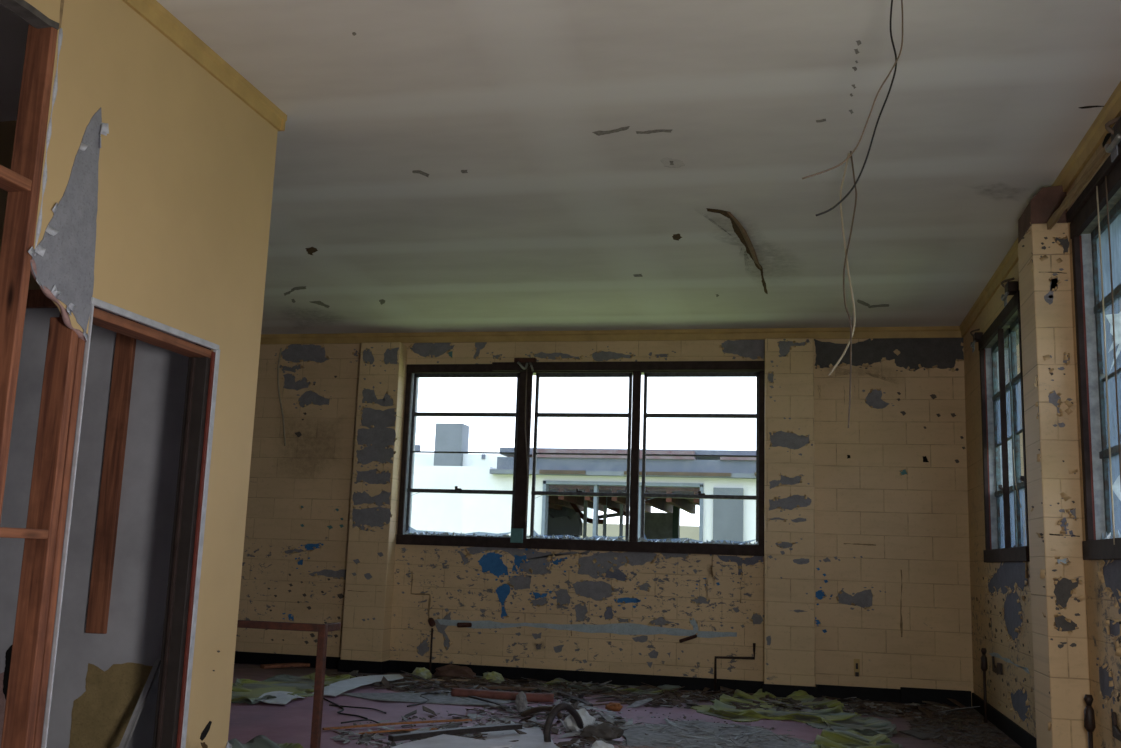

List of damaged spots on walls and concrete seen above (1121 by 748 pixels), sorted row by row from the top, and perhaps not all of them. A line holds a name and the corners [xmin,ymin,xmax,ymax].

peeling [28,244,46,257]
peeling [275,344,332,437]
peeling [719,338,964,402]
peeling [327,343,455,532]
peeling [769,417,813,456]
peeling [766,473,812,524]
peeling [1029,492,1080,538]
spalling [3,645,12,699]
peeling [268,543,372,621]
peeling [444,538,886,668]
peeling [976,555,1087,653]
peeling [1096,559,1121,718]